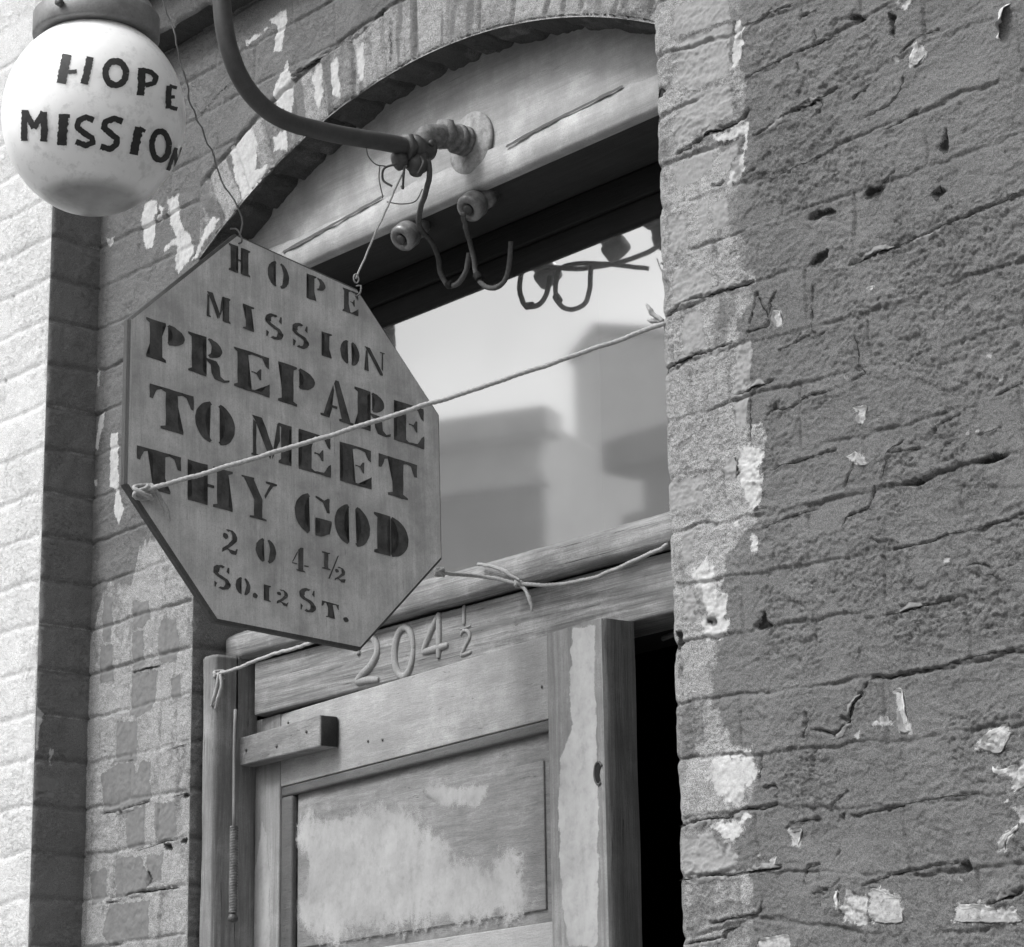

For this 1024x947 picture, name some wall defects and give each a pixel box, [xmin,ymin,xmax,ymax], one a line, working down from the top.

peeling [994,4,1010,40]
peeling [893,40,928,68]
peeling [671,0,743,187]
peeling [847,452,869,467]
crack [844,439,916,523]
peeling [872,688,913,735]
crack [804,647,1019,738]
peeling [973,722,1024,853]
peeling [833,885,904,927]
peeling [950,899,1022,927]